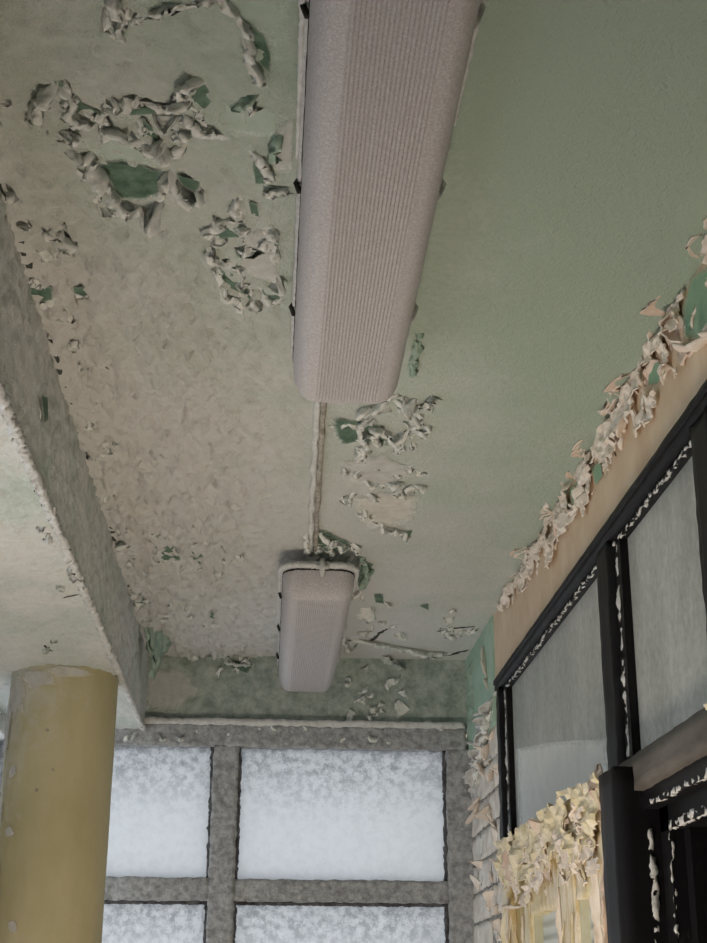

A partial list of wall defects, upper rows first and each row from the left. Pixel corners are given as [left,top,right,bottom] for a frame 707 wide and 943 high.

peeling [100,0,271,118]
peeling [24,77,232,238]
peeling [199,120,294,315]
spalling [73,287,91,301]
spalling [329,394,443,542]
spalling [408,333,425,379]
peeling [497,216,707,612]
peeling [437,608,479,641]
peeling [463,646,608,943]